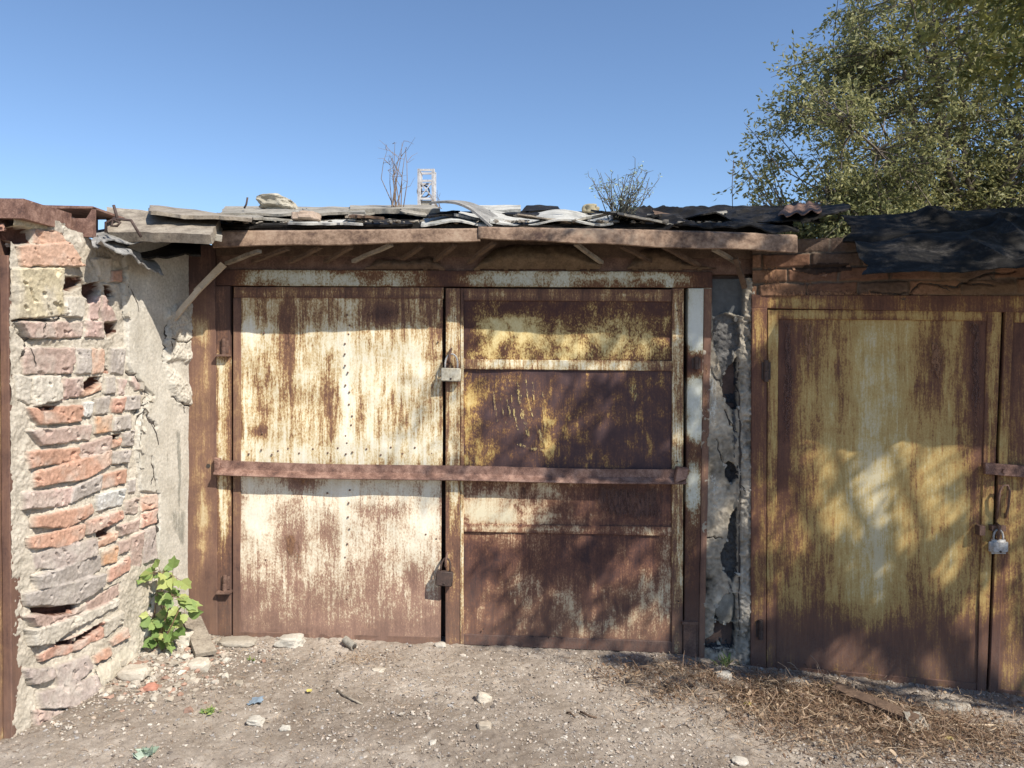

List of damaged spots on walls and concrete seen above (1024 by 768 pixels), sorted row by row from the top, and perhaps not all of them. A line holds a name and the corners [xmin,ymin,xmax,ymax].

spalling [712,314,740,410]
flaking render [134,374,156,469]
spalling [722,461,739,484]
spalling [720,508,741,578]
spalling [704,593,737,649]